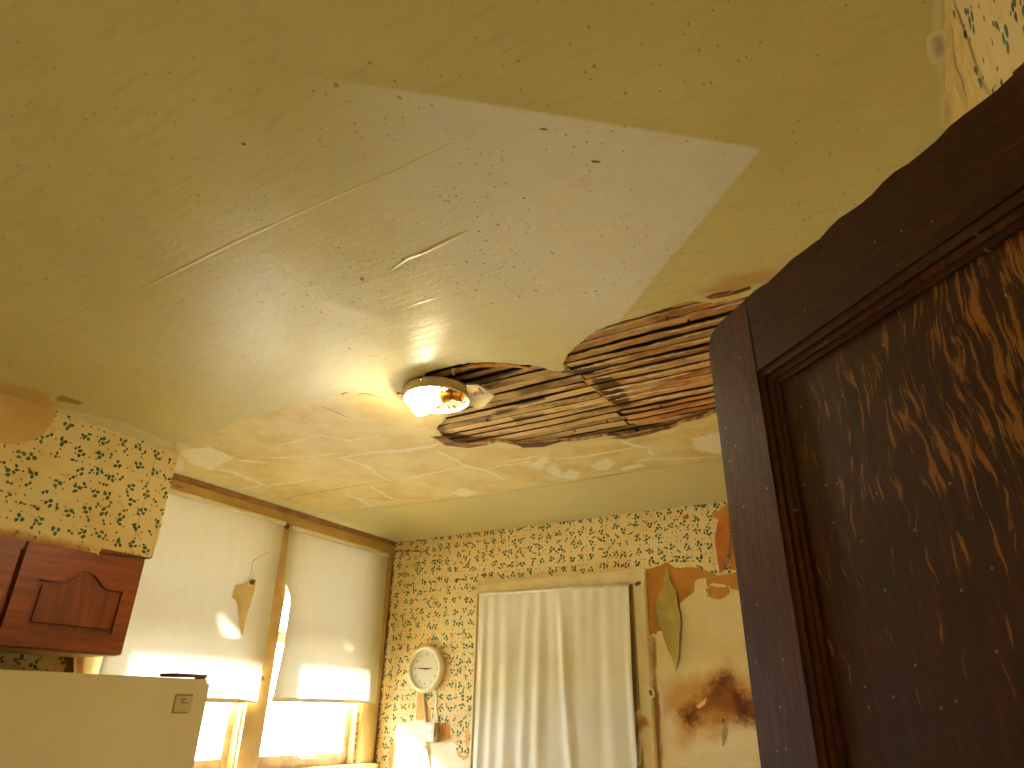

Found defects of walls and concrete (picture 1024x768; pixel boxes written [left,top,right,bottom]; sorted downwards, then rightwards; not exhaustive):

peeling [175,286,751,511]
flaking render [655,516,747,675]
water stain [634,634,758,768]
flaking render [664,738,761,768]